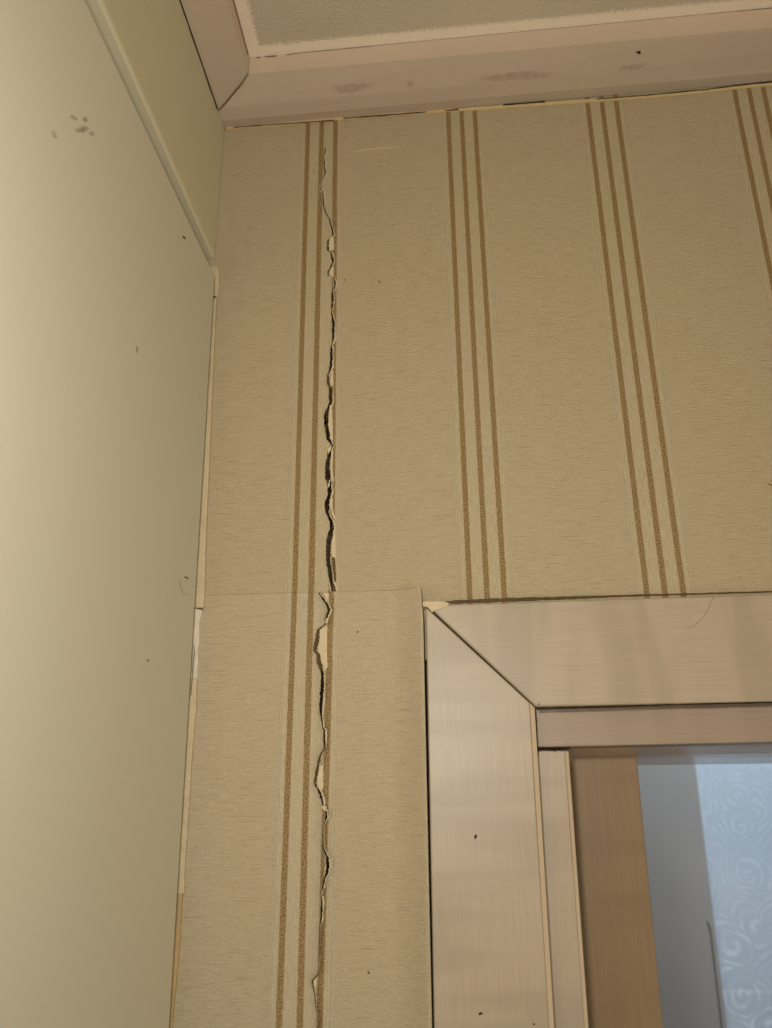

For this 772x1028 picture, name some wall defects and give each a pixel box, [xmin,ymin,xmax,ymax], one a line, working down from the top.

crack [311,148,338,1014]